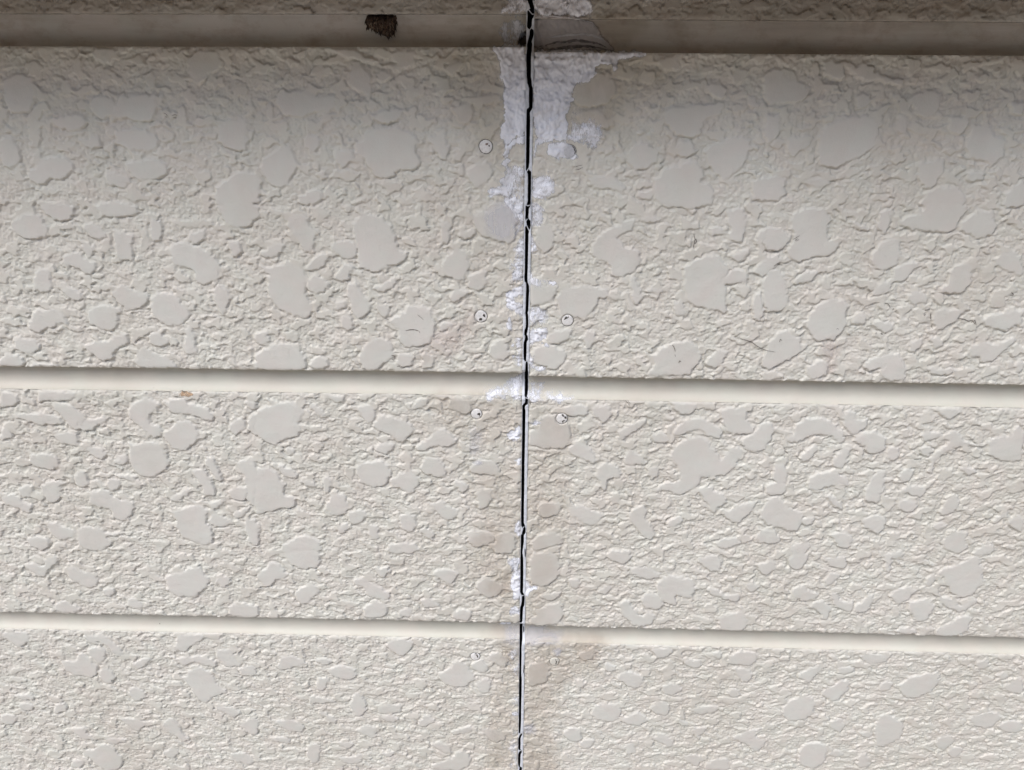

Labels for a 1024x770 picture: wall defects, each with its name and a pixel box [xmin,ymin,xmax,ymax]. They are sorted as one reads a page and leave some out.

crack [518,2,534,767]